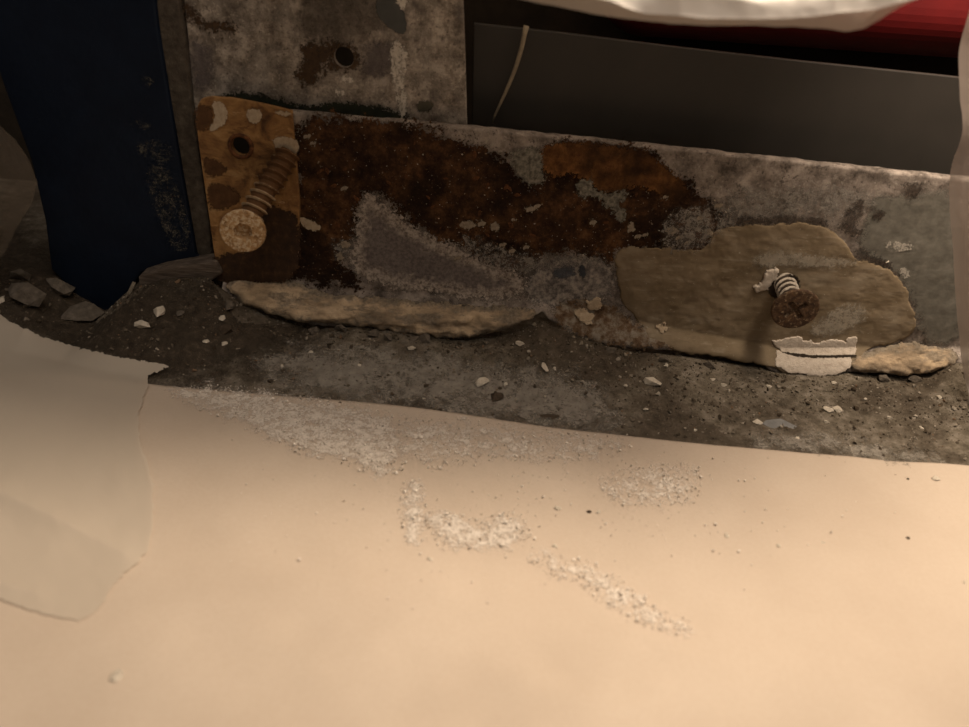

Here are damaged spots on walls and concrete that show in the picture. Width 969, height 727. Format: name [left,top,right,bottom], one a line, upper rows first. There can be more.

rust [194,103,213,132]
rust [203,157,241,210]
rust [212,106,960,352]
peeling [614,221,916,376]
spalling [643,377,662,386]